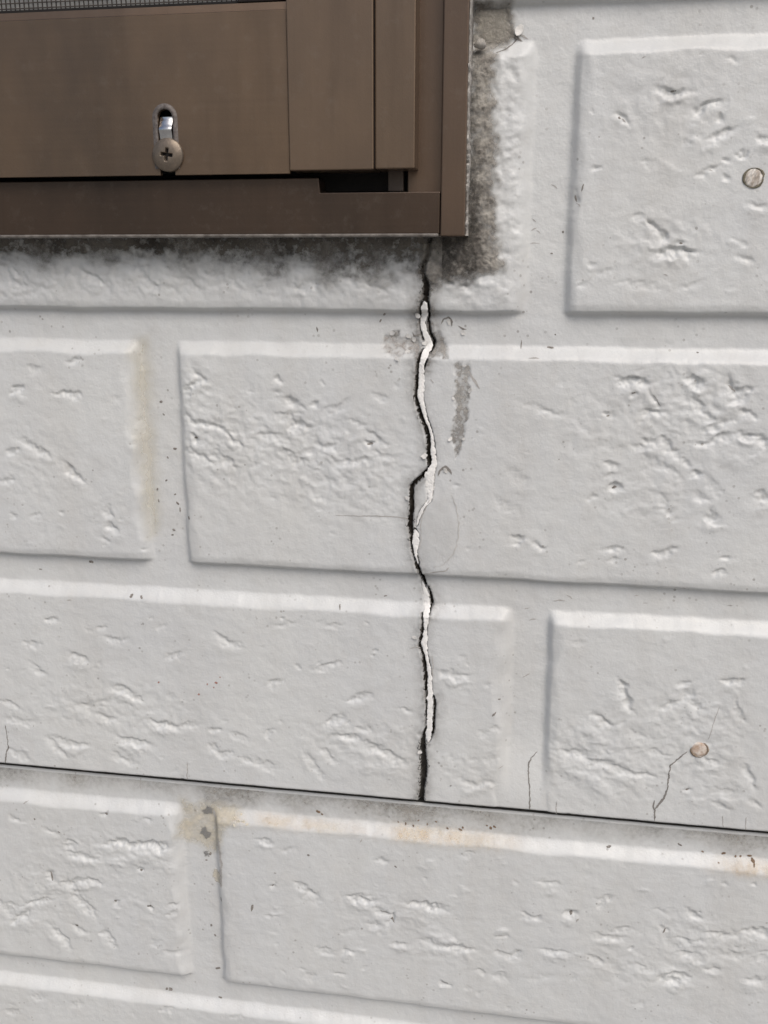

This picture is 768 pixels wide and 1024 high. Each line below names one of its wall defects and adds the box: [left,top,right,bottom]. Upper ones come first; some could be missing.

leakage [0,223,475,272]
crack [336,238,448,800]